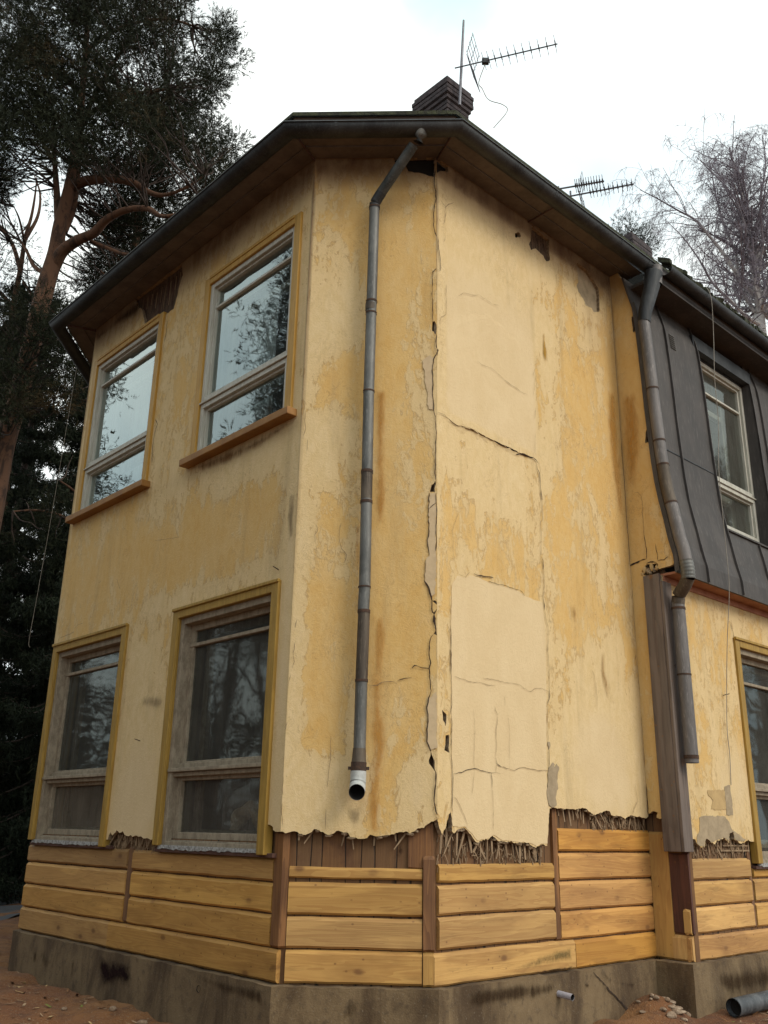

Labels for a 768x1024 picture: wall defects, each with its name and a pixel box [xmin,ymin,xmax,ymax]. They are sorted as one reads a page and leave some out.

spalling [529,230,547,261]
crack [371,171,550,829]
peeling [697,785,745,847]